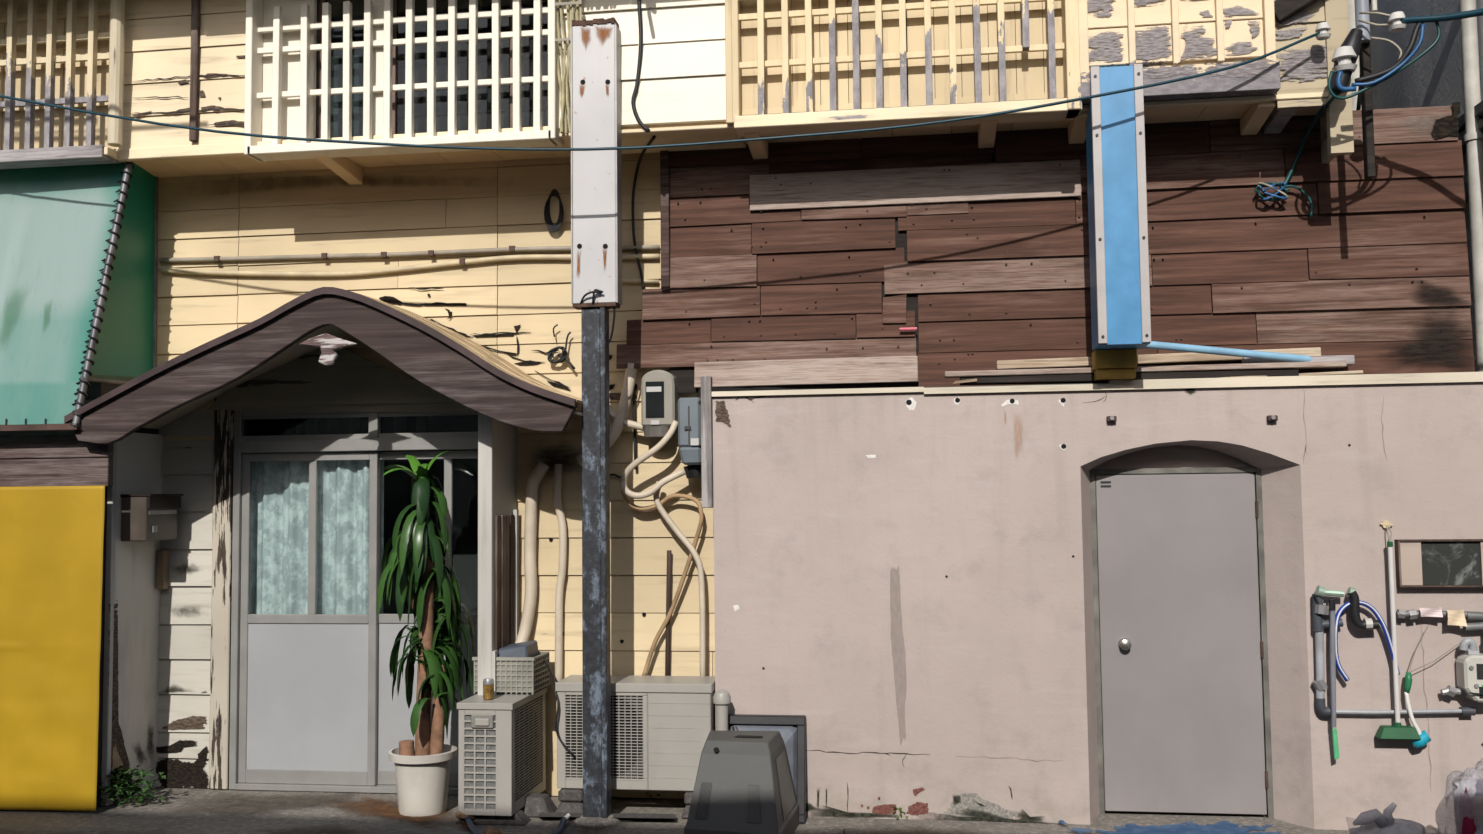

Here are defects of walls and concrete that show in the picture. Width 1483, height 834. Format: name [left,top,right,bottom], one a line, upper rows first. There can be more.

rust [582,28,610,46]
peeling [1087,0,1327,83]
leakage [1393,284,1467,366]
crack [806,750,1063,834]